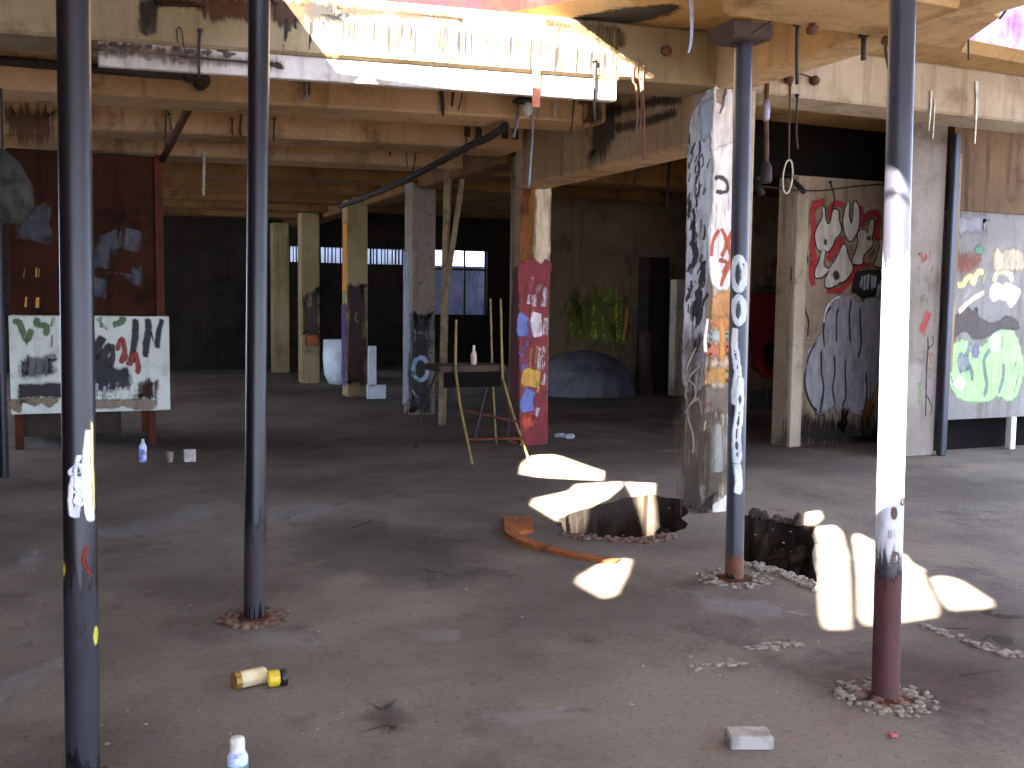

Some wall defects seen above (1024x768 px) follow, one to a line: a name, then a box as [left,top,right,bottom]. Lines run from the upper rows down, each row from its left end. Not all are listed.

hole [557,494,688,538]
hole [744,515,817,582]